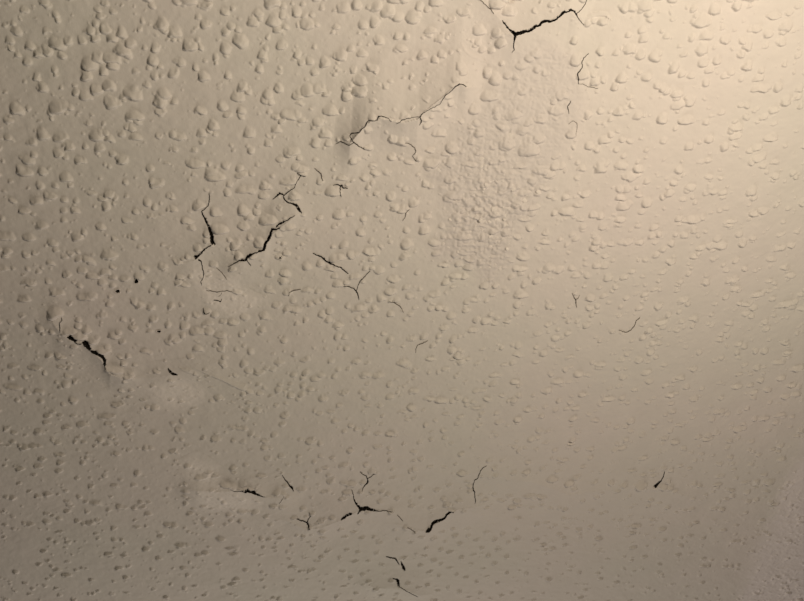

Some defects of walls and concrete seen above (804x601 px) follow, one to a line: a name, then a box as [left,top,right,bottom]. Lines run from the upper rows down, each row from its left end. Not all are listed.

crack [482,0,587,51]
crack [336,83,466,150]
flaking render [418,27,590,292]
crack [195,171,348,315]
crack [59,317,106,367]
crack [231,475,294,504]
crack [341,474,454,533]